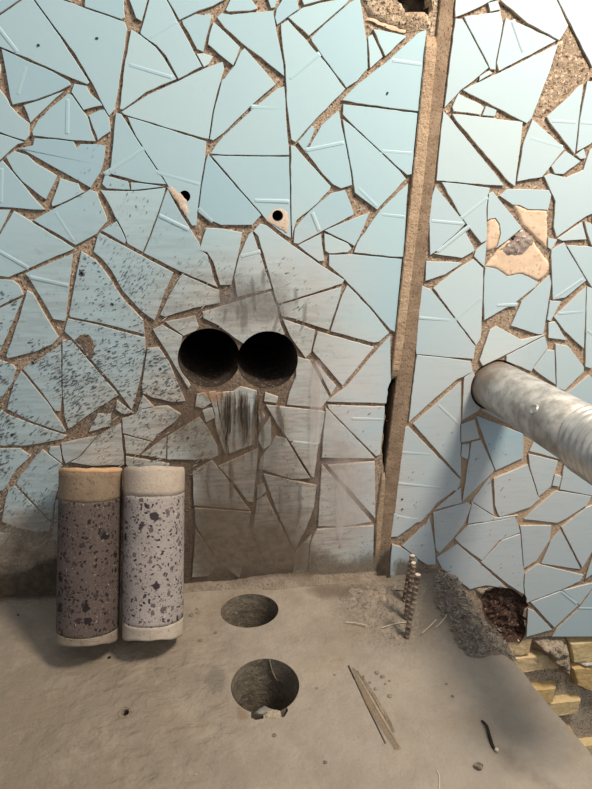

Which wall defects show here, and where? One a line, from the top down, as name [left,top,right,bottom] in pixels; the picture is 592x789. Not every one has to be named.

flaking render [360,0,434,33]
spalling [485,205,549,281]
leakage [219,391,265,498]
spalling [473,586,528,643]